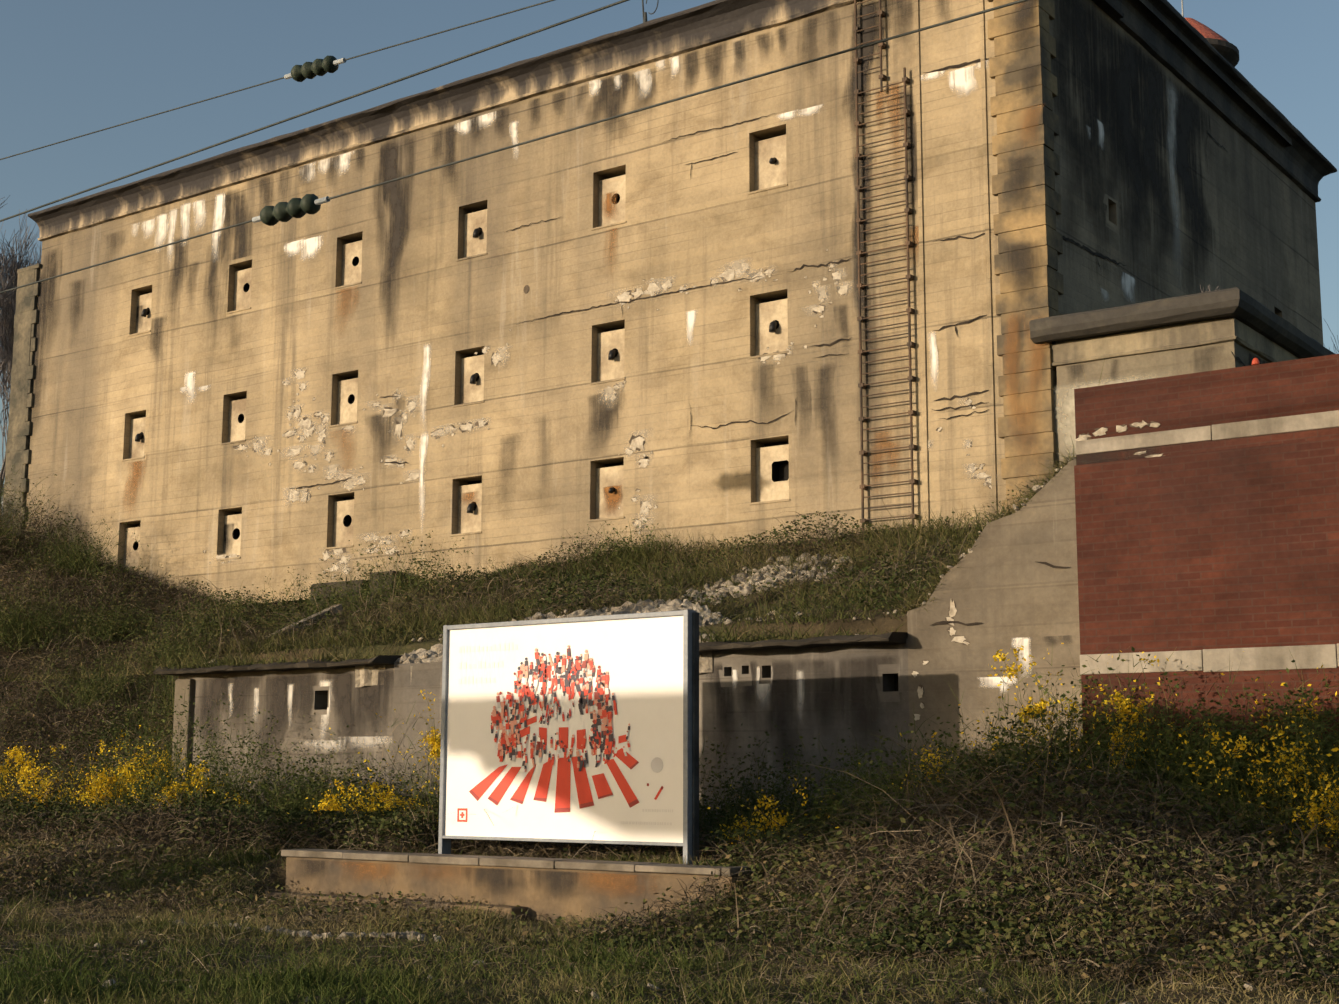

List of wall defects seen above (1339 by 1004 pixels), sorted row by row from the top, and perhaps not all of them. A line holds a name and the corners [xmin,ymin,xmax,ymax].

leakage [581,41,743,121]
leakage [436,109,517,175]
leakage [134,194,251,303]
leakage [284,236,321,256]
spalling [614,260,778,311]
crack [933,313,993,337]
spalling [233,369,366,503]
crack [690,399,796,430]
crack [932,390,989,419]
spalling [1075,420,1160,441]
rust [130,461,141,493]
rust [604,486,620,507]